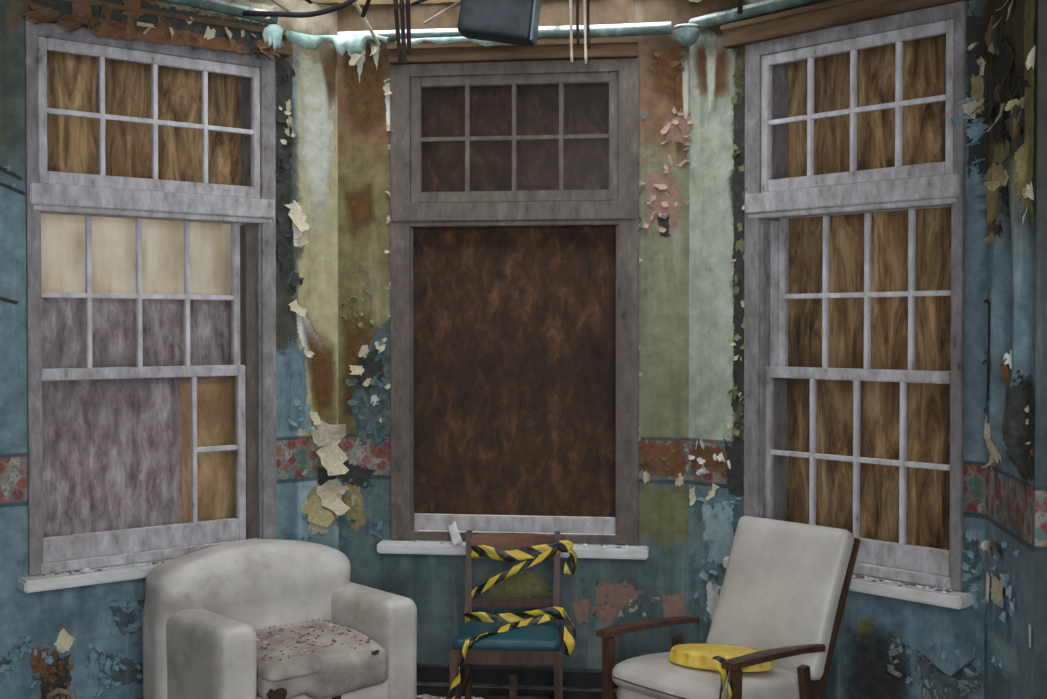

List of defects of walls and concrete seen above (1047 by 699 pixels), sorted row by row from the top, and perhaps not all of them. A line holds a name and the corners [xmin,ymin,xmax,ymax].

peeling [383,78,393,131]
peeling [637,47,694,239]
peeling [951,3,989,212]
spalling [16,0,391,448]
peeling [981,289,1034,496]
peeling [0,628,143,699]
peeling [105,597,145,635]
spalling [572,497,741,627]
peeling [887,635,1008,699]